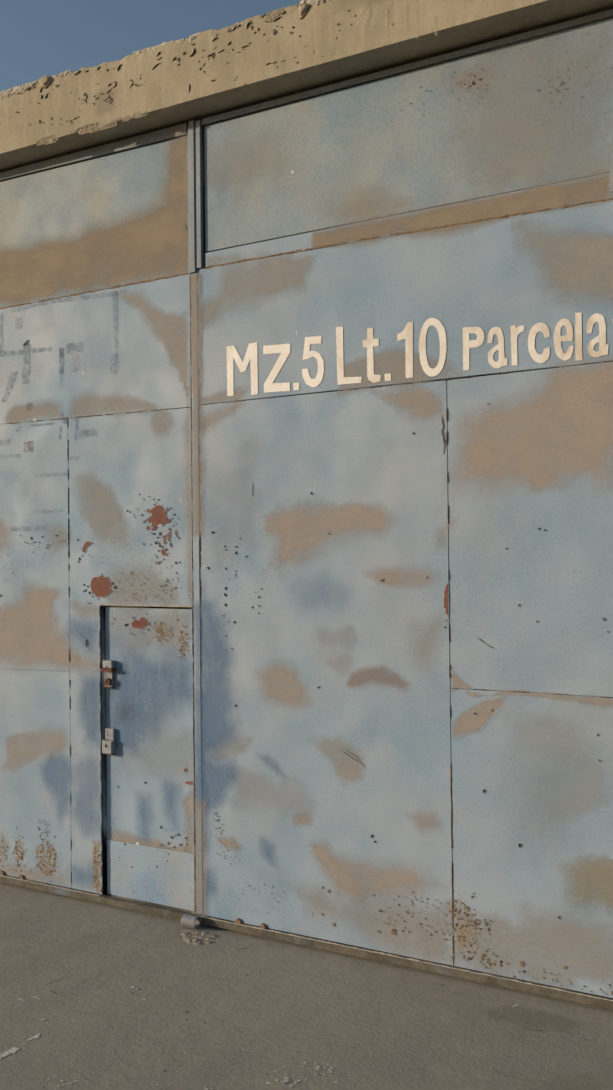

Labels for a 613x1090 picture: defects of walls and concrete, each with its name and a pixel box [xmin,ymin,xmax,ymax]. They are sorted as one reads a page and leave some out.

peeling [130,0,330,88]
spalling [0,80,39,99]
spalling [29,64,147,146]
corrosion [0,820,61,882]
corrosion [92,841,118,892]
corrosion [373,885,529,978]